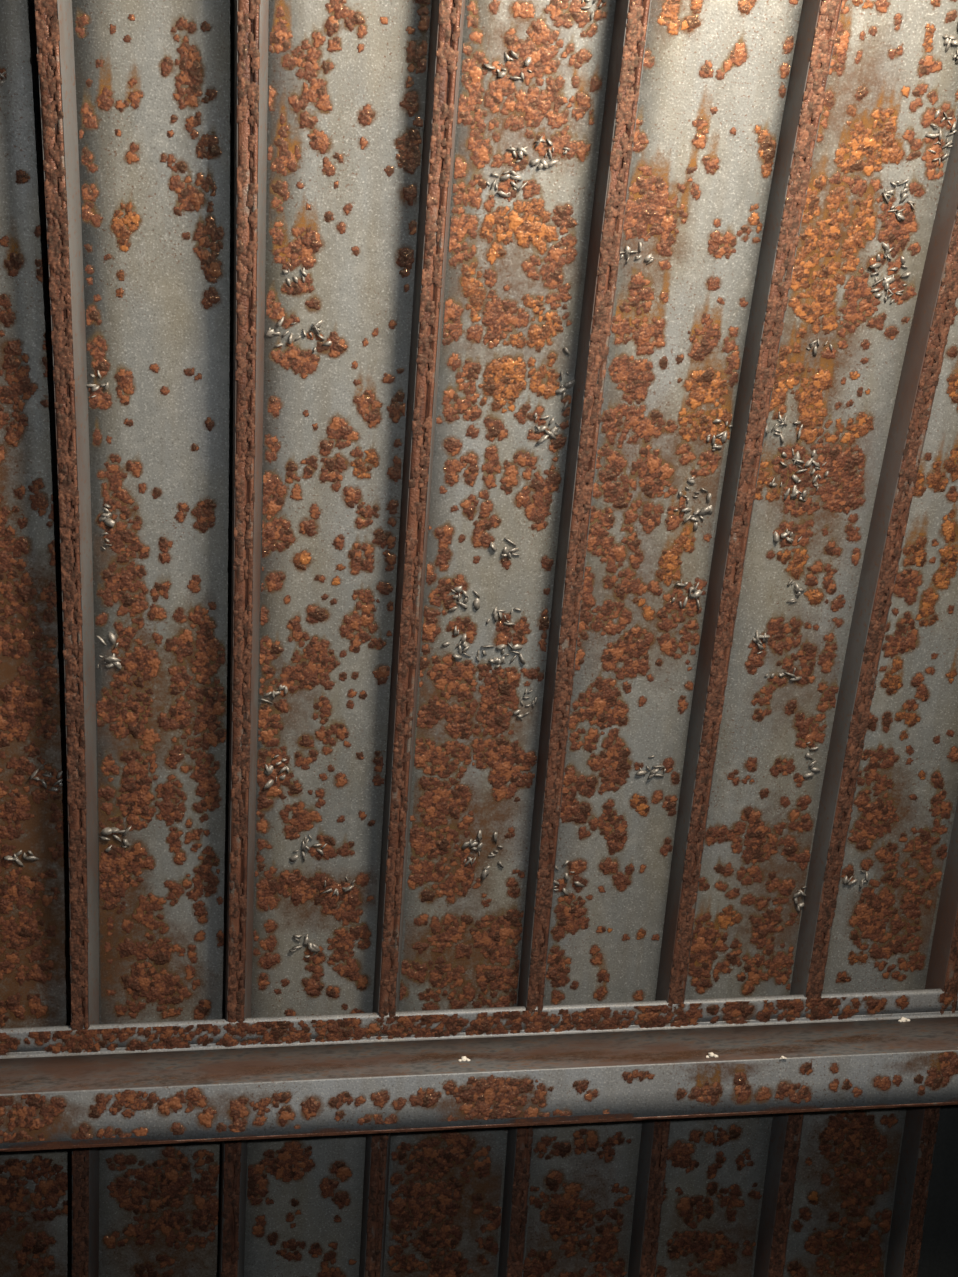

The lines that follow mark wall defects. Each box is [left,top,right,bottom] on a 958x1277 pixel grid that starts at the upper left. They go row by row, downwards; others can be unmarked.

corrosion [745,0,958,751]
corrosion [836,440,958,983]
corrosion [612,1052,694,1084]
corrosion [656,1046,958,1277]